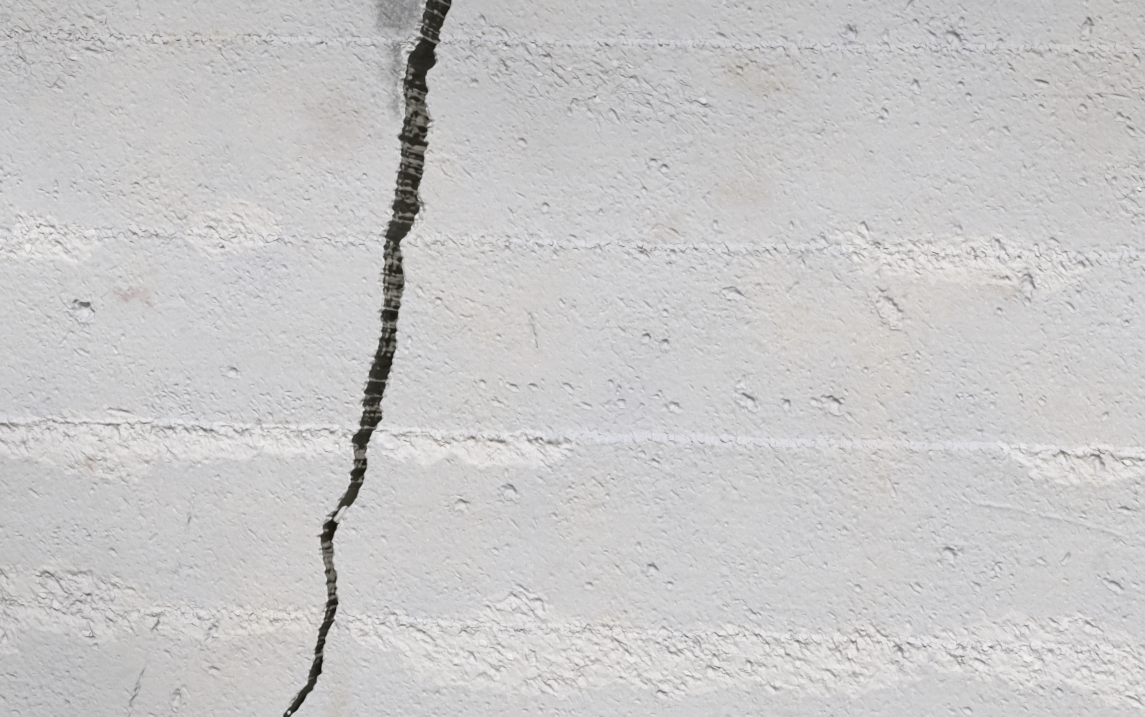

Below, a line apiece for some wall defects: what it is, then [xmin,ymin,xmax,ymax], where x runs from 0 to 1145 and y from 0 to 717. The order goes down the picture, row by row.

crack [281,0,455,717]